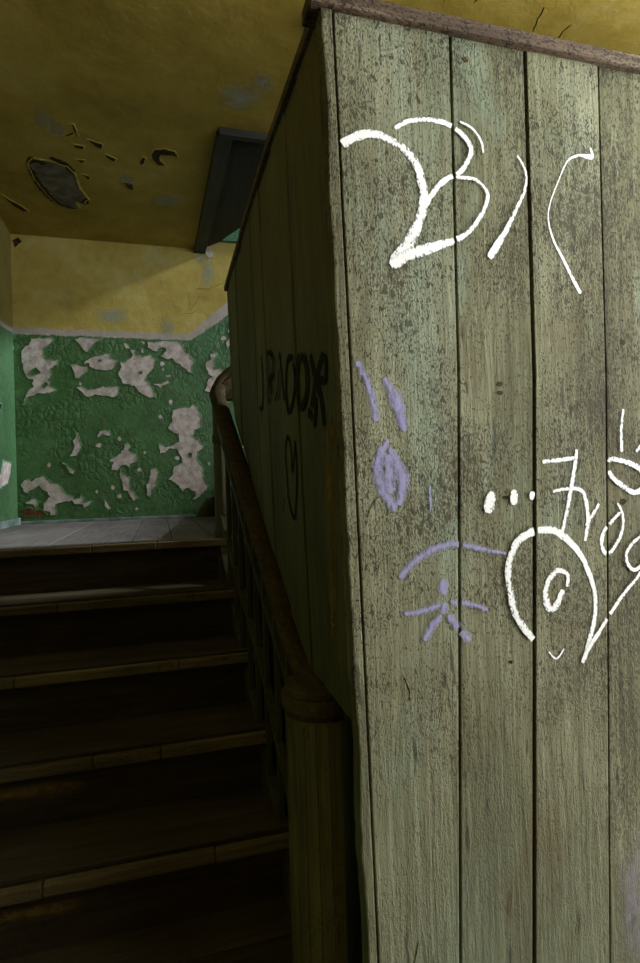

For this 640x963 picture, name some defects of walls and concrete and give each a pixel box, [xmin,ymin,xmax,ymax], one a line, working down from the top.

spalling [27,123,118,210]
peeling [138,148,179,166]
peeling [12,323,230,406]
peeling [0,432,111,518]
peeling [96,400,210,510]